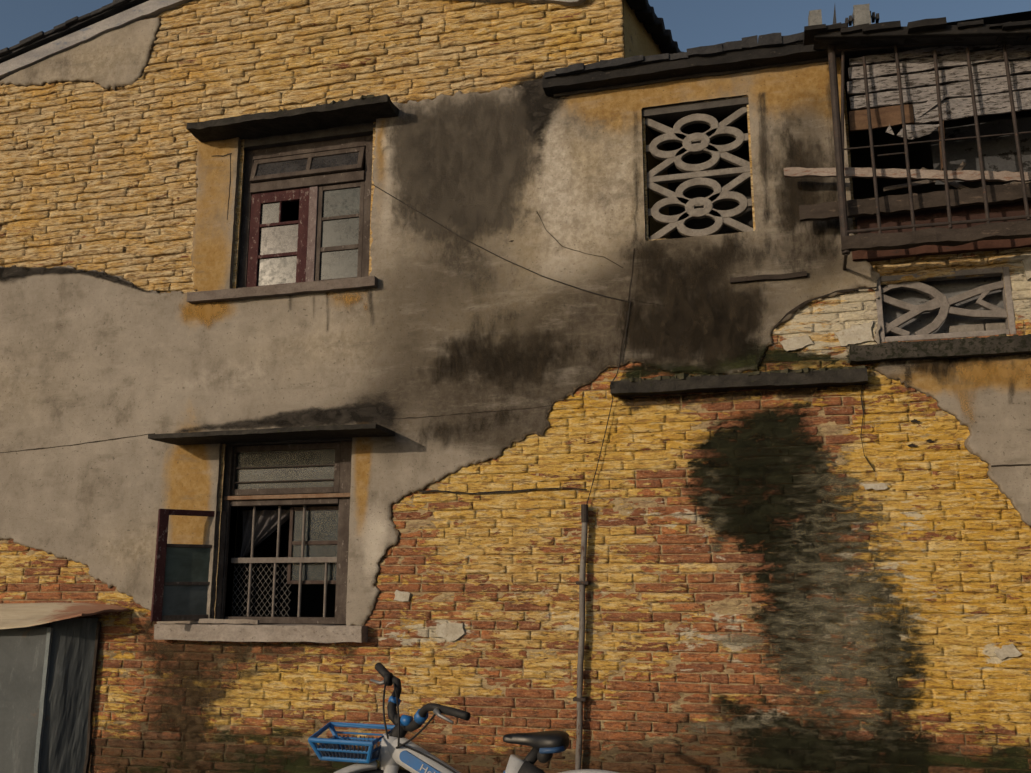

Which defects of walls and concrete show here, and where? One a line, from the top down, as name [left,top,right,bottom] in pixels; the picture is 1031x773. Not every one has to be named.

flaking render [0,0,625,294]
damp [515,73,566,144]
damp [760,94,840,261]
damp [434,331,571,389]
damp [622,234,770,369]
crack [419,486,587,494]
flaking render [0,247,1031,773]
damp [621,382,933,773]